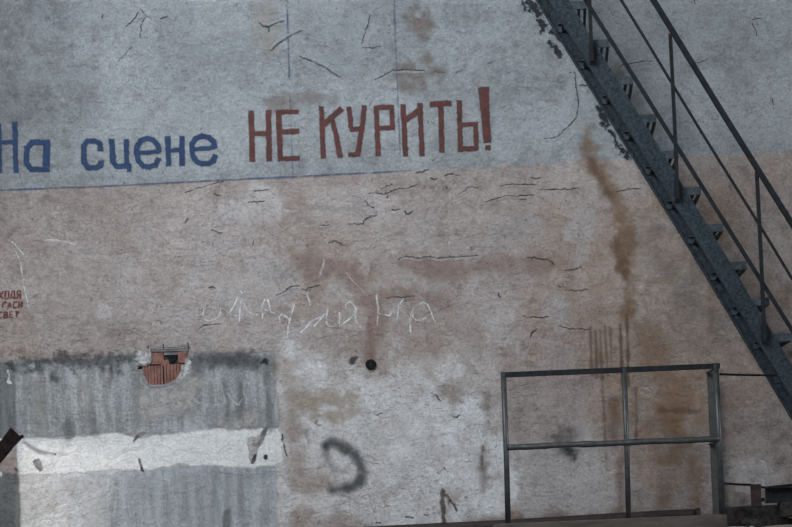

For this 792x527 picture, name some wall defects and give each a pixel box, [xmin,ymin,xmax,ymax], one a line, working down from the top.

crack [117,9,168,62]
crack [259,17,302,51]
crack [299,53,342,78]
crack [374,69,425,83]
crack [544,71,587,142]
crack [300,169,578,245]
crack [397,254,478,263]
crack [276,285,321,299]
flaking render [131,343,191,388]